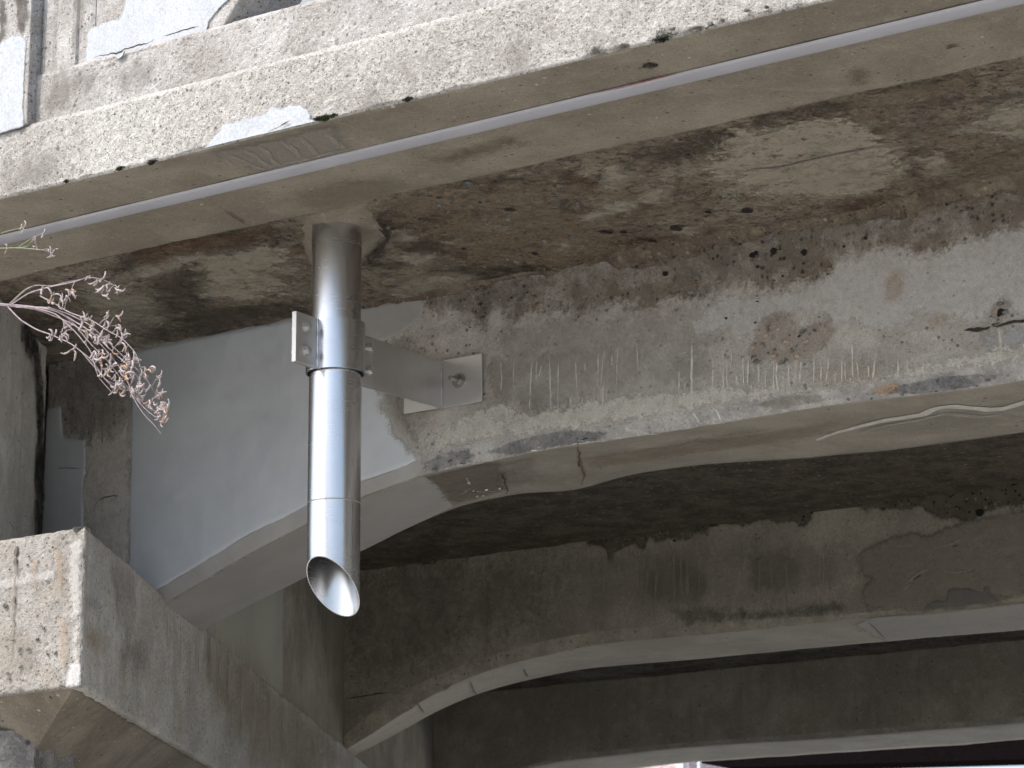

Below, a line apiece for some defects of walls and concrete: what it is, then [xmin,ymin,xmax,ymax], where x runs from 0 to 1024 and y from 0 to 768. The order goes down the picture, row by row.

leakage [648,103,857,168]
leakage [111,233,305,336]
peeling [389,190,1024,367]
crack [963,319,1024,332]
leakage [427,327,1024,455]
spalling [874,375,996,394]
crack [816,400,1024,441]
spalling [496,430,604,455]
crack [574,446,586,484]